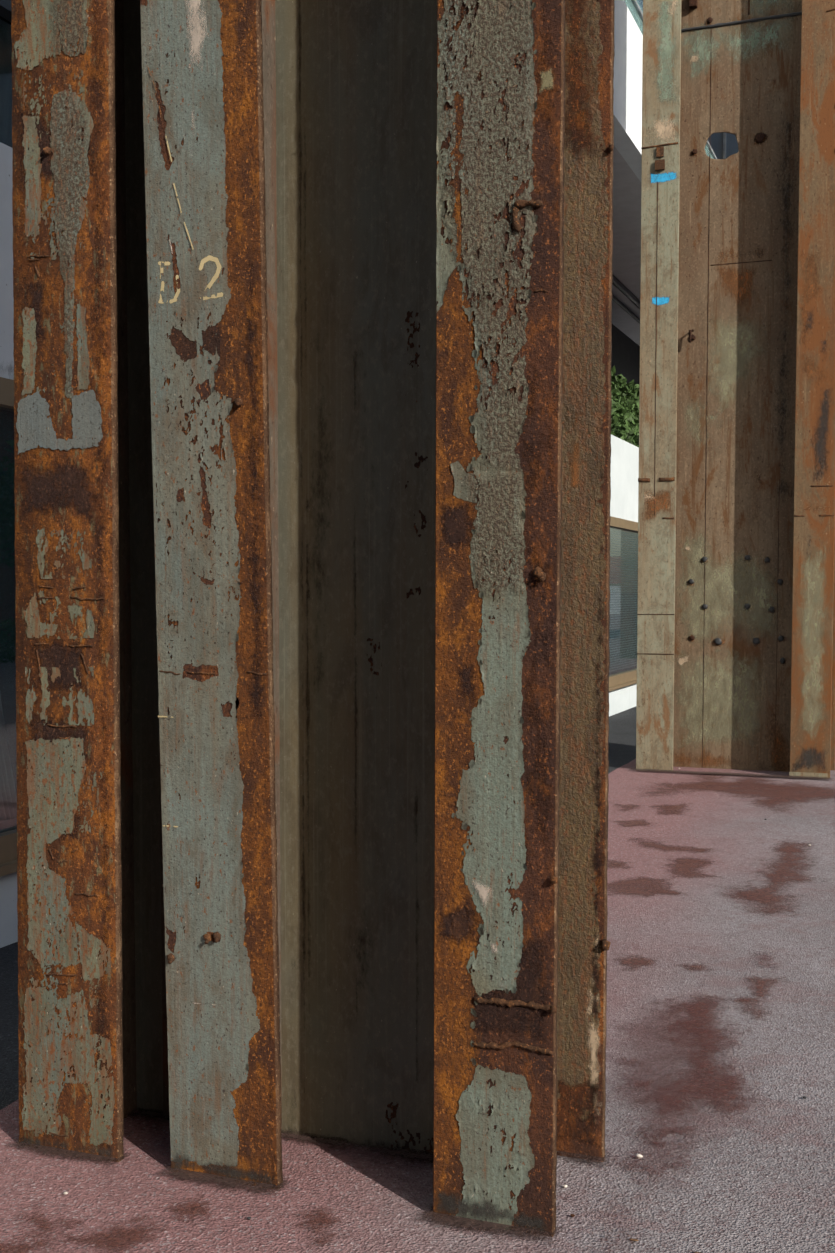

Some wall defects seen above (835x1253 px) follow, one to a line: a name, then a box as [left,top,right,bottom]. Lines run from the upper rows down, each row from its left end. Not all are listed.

peeling [14,0,94,398]
corrosion [20,1,107,400]
peeling [23,529,95,639]
corrosion [32,641,87,693]
peeling [140,0,277,1190]
peeling [434,0,609,1237]
peeling [22,667,115,1146]
corrosion [439,903,546,1040]
corrosion [556,939,601,1144]
damp [620,955,781,1115]
damp [607,748,835,897]
damp [723,842,812,915]